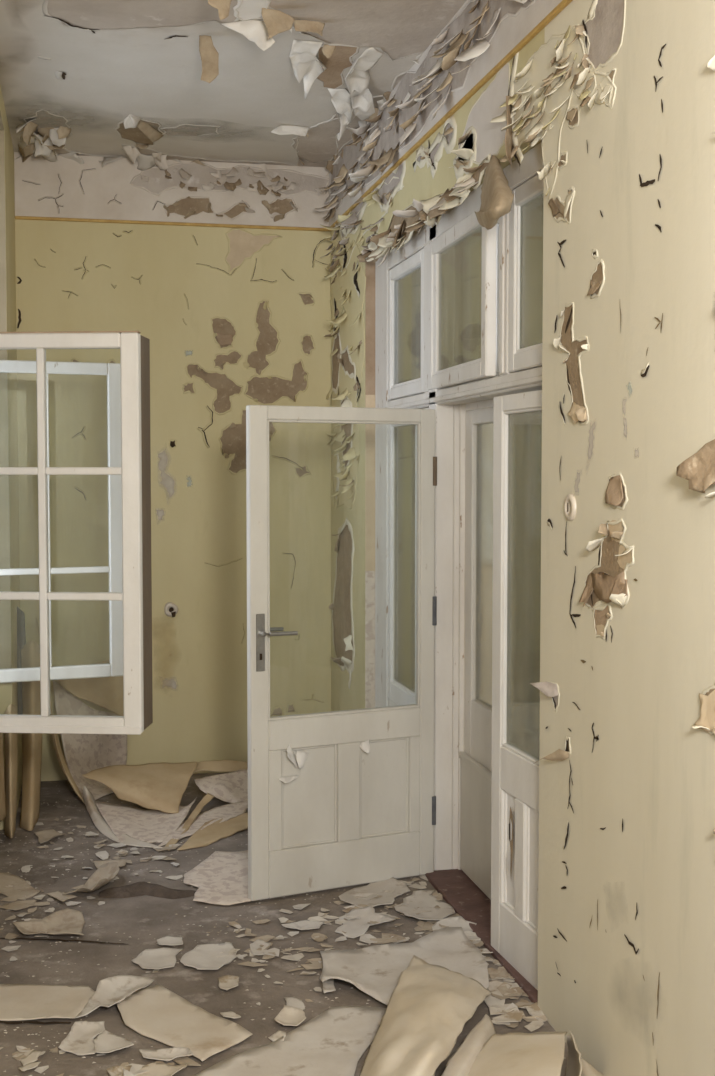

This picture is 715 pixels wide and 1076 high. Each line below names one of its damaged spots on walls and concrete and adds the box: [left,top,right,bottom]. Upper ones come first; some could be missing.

peeling [15,0,626,474]
peeling [605,475,623,506]
peeling [676,439,715,498]
peeling [326,423,360,689]
peeling [579,518,634,643]
peeling [691,683,715,736]